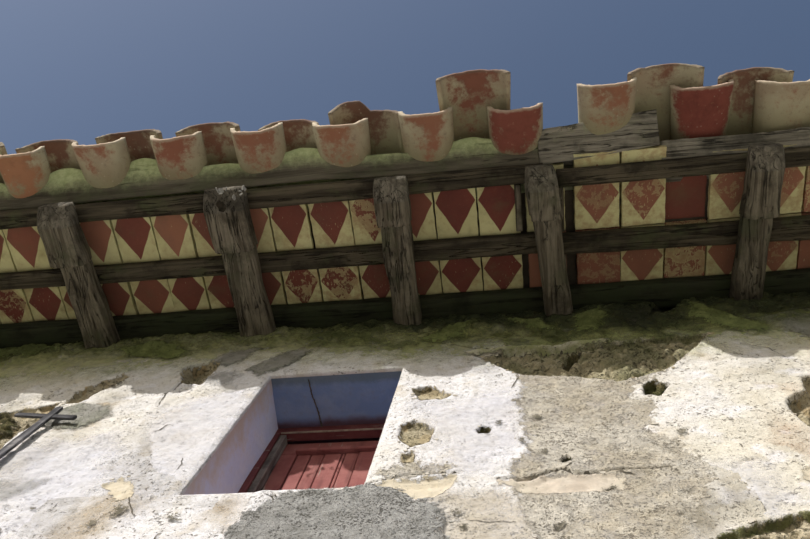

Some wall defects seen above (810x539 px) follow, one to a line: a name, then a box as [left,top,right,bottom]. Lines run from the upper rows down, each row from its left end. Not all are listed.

flaking render [0,373,130,449]
flaking render [178,360,220,385]
crack [308,379,322,427]
flaking render [411,386,457,401]
flaking render [787,376,810,426]
peeling [375,419,458,500]
crack [516,462,641,482]
peeling [469,332,719,539]
flaking render [717,516,810,539]